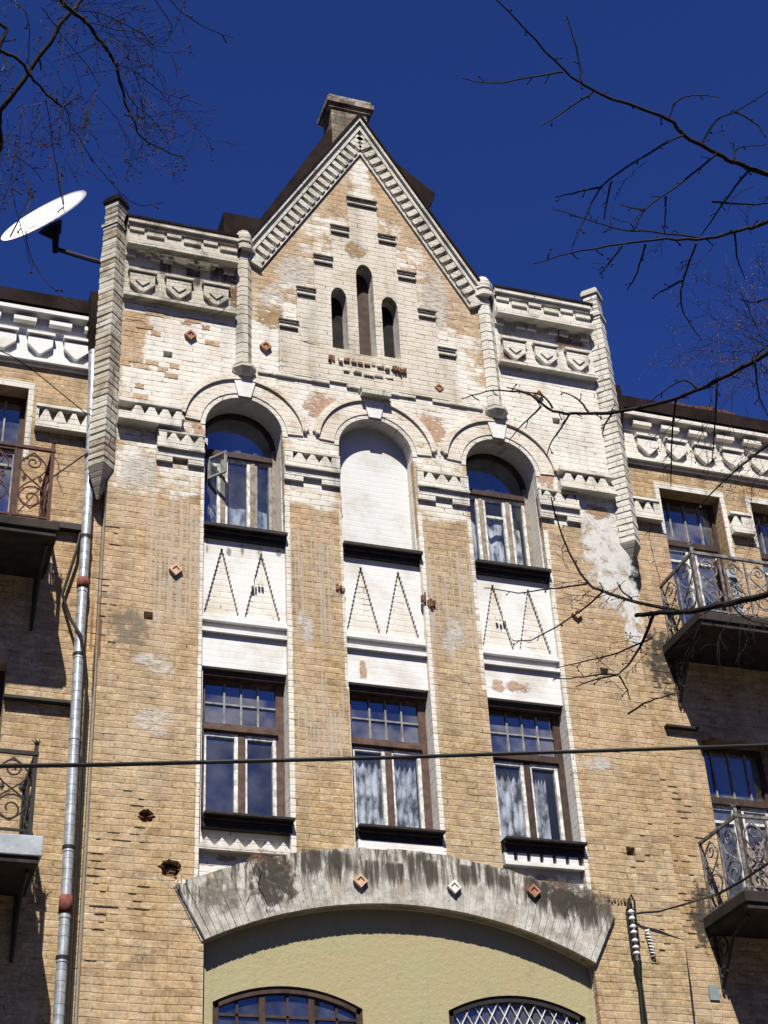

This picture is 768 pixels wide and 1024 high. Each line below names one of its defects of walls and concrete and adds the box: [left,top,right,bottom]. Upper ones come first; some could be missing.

peeling [345,241,369,258]
peeling [121,310,164,337]
peeling [180,317,220,347]
peeling [256,302,284,329]
peeling [121,357,179,379]
peeling [492,680,528,692]
hole [137,809,156,822]
spalling [157,861,185,884]
leakage [198,849,352,910]
leakage [364,853,438,887]
leakage [460,864,510,890]
leakage [524,876,611,924]